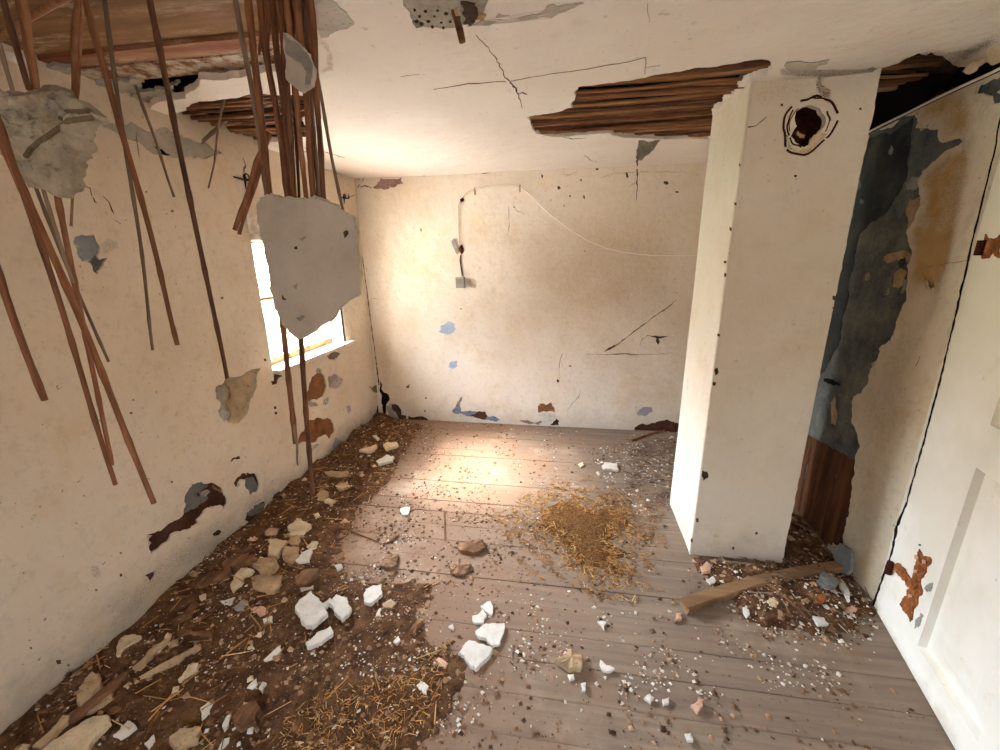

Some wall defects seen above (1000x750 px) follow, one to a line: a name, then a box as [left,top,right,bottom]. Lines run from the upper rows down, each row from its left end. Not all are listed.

peeling [314,0,354,38]
peeling [412,2,584,29]
crack [434,35,660,107]
peeling [73,235,106,273]
peeling [804,115,963,479]
crack [590,292,678,355]
flaking render [307,372,326,401]
flaking render [298,418,334,444]
peeling [452,397,559,426]
flaking render [634,407,679,432]
flaking render [234,473,258,494]
flaking render [147,482,226,551]